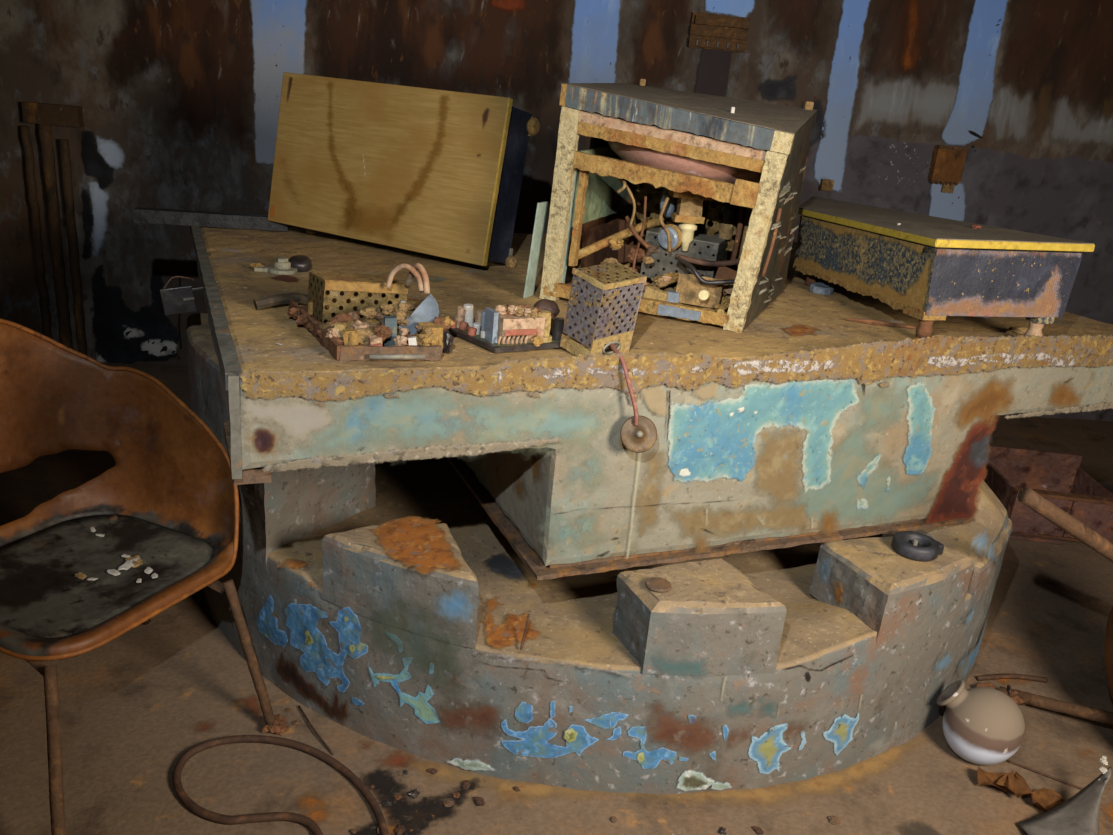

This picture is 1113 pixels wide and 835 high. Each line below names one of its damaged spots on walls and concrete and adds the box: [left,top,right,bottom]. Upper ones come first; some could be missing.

corrosion [866,0,967,80]
corrosion [254,429,276,452]
spalling [239,335,1113,523]
corrosion [926,380,1013,524]
corrosion [371,516,462,574]
corrosion [483,597,540,649]
peeling [257,595,440,724]
water stain [352,758,495,835]
peeling [501,701,689,769]
water stain [677,770,732,791]
peeling [748,723,806,774]
peeling [823,713,859,755]